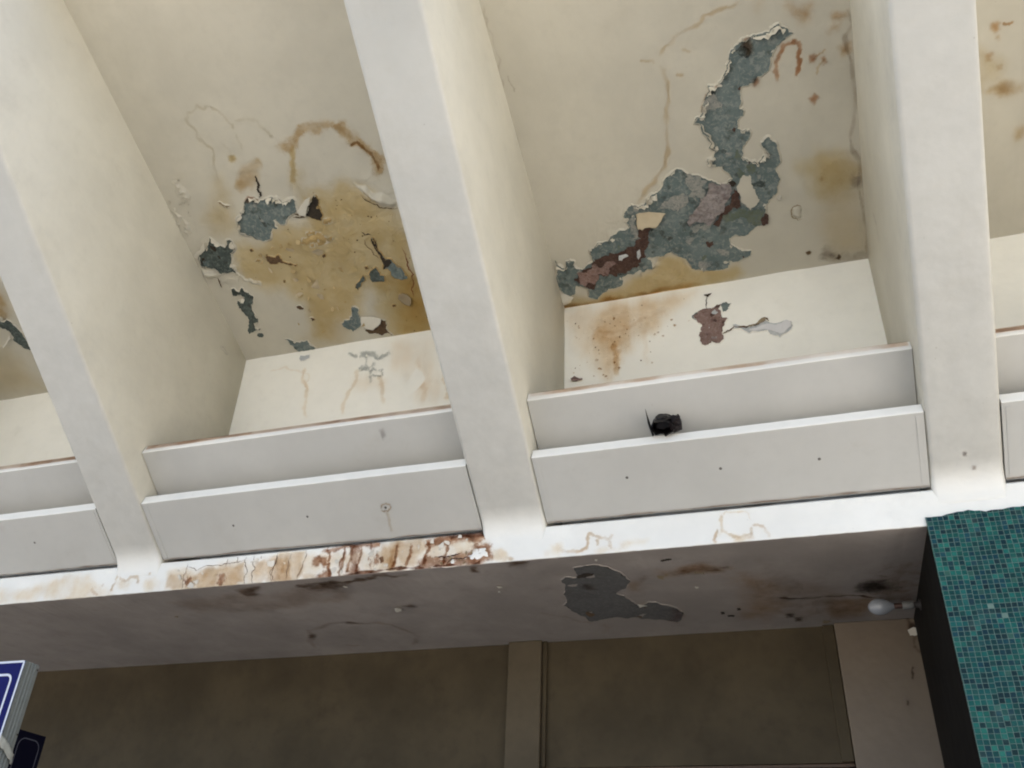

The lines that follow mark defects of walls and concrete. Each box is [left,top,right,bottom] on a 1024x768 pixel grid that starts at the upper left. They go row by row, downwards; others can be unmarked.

peeling [555,22,793,306]
peeling [194,176,324,338]
peeling [355,232,411,307]
peeling [0,317,31,350]
peeling [284,338,317,361]
peeling [341,305,394,336]
peeling [692,293,793,346]
corrosion [174,549,290,588]
corrosion [316,540,410,581]
flaking render [561,564,684,623]